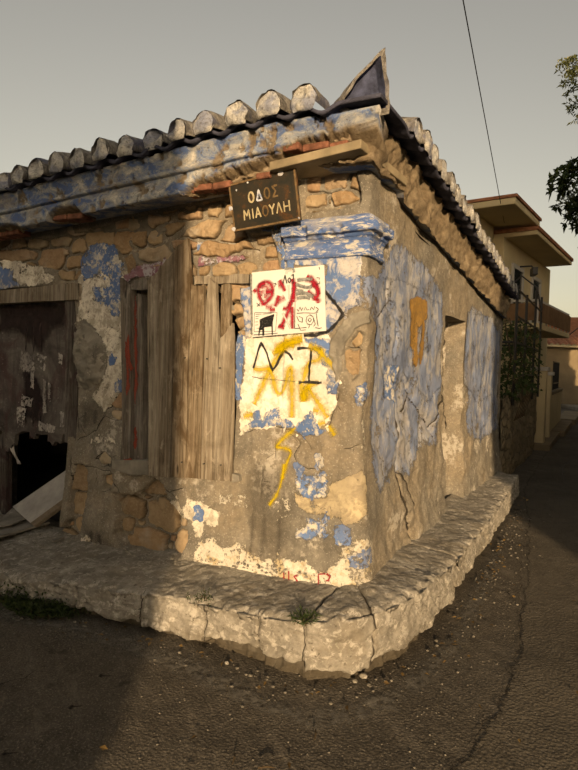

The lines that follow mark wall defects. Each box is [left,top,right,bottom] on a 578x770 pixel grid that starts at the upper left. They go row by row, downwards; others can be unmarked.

peeling [0,197,444,569]
peeling [464,306,501,443]
crack [302,590,335,661]
crack [360,592,377,665]